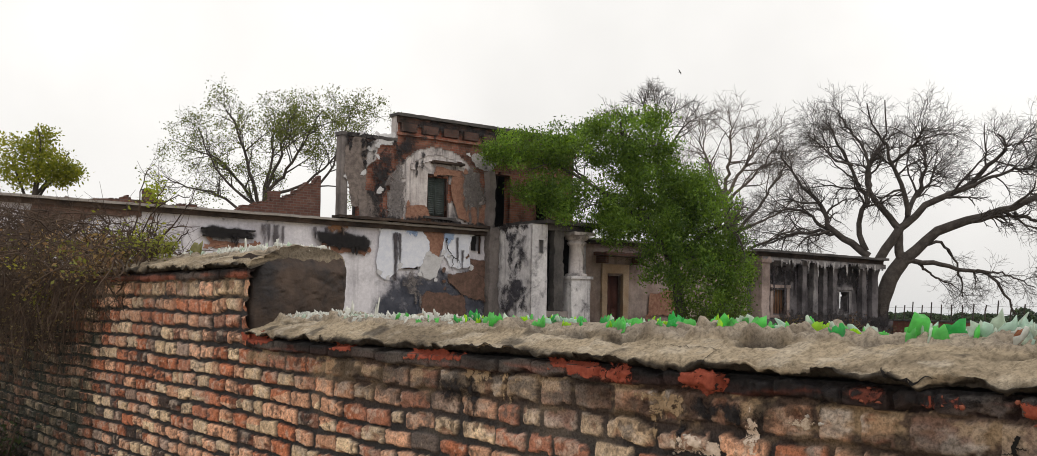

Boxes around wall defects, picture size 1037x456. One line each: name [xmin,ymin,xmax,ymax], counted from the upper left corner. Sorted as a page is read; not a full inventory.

damp [254,211,294,245]
flaking render [402,200,485,317]
damp [374,215,528,317]
flaking render [434,166,486,225]